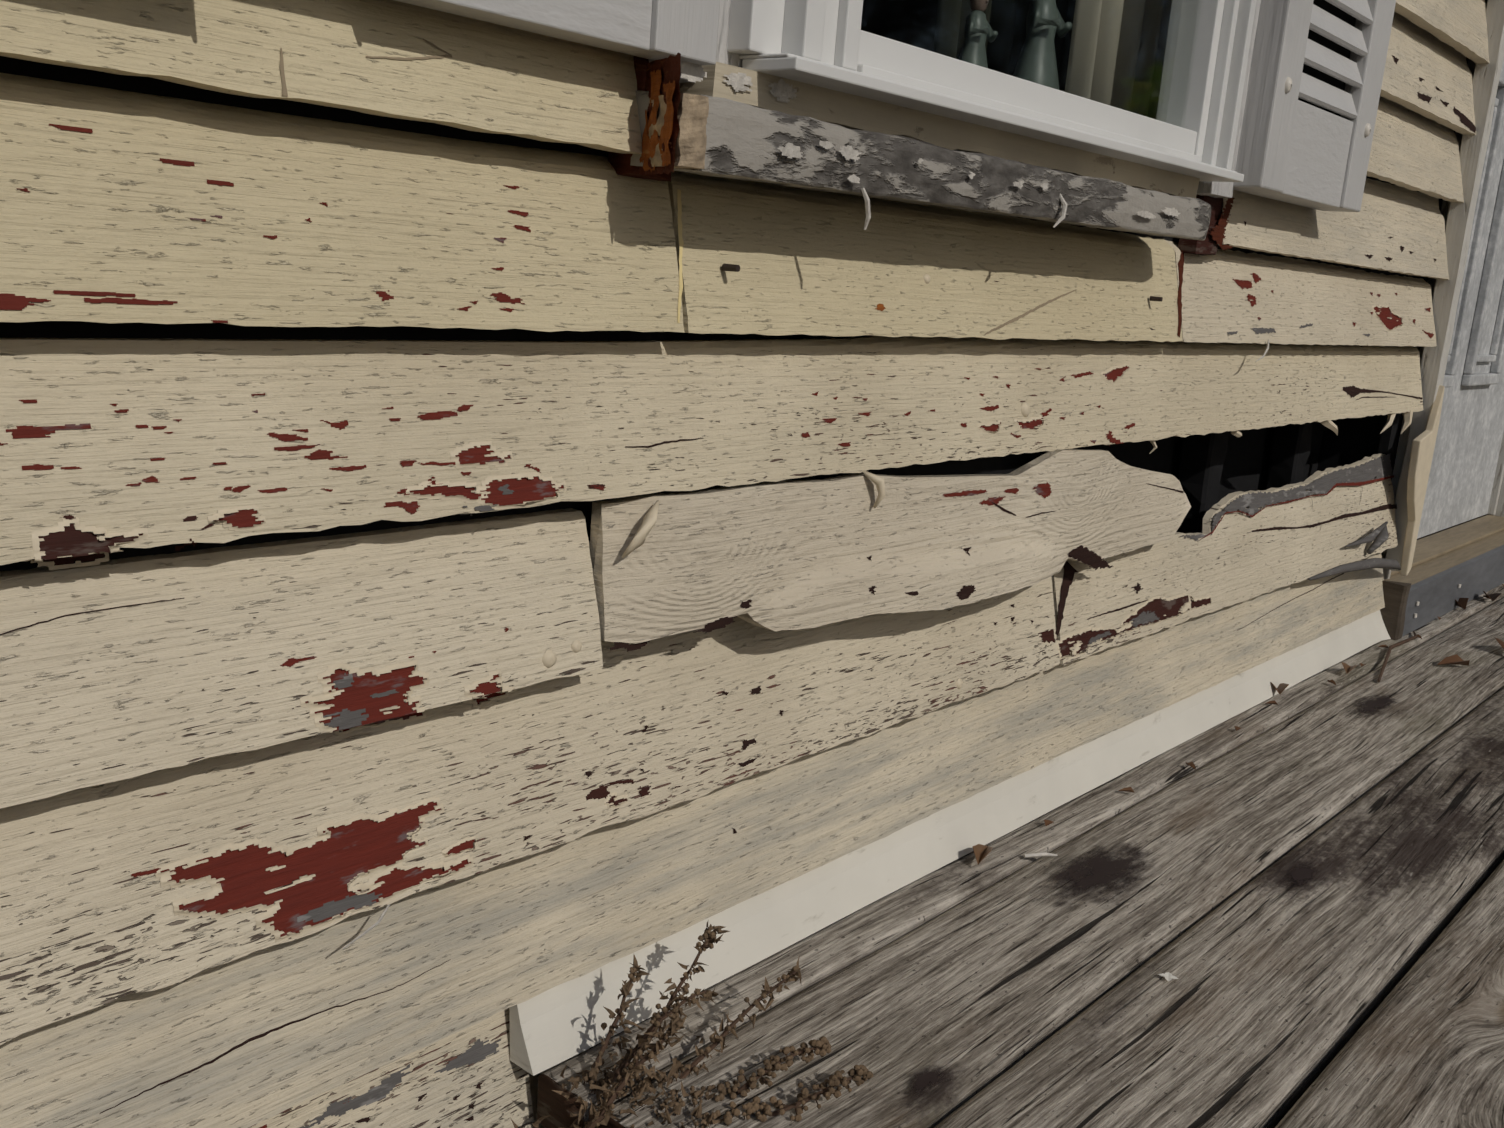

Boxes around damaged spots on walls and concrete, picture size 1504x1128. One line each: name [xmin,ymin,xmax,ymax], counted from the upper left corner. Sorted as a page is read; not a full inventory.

peeling [681,61,797,103]
rust [639,52,681,175]
peeling [778,143,803,159]
peeling [819,141,861,183]
peeling [1136,207,1181,219]
peeling [1059,363,1130,384]
peeling [960,377,1101,438]
peeling [1090,423,1135,447]
peeling [943,482,1052,506]
peeling [131,796,476,943]